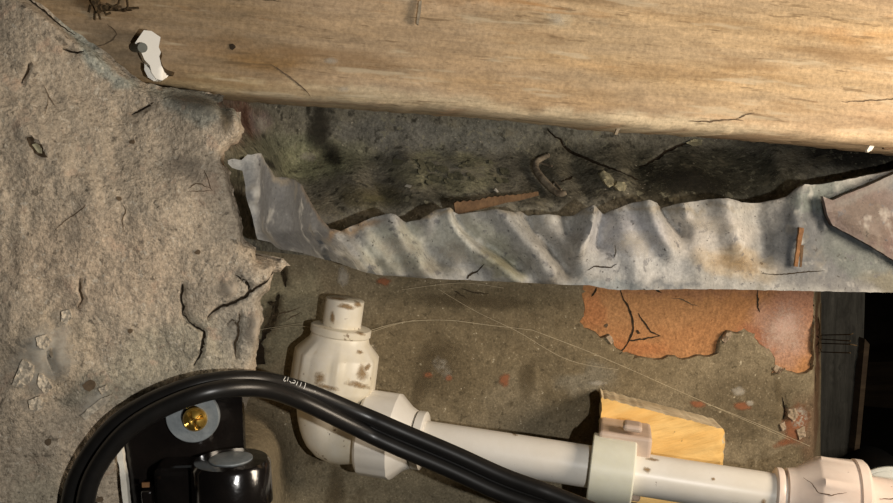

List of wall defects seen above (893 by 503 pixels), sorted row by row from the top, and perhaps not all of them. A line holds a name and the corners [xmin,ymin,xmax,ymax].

spalling [27,137,48,158]
water stain [324,144,340,165]
crack [180,270,301,365]
flaking render [580,285,814,374]